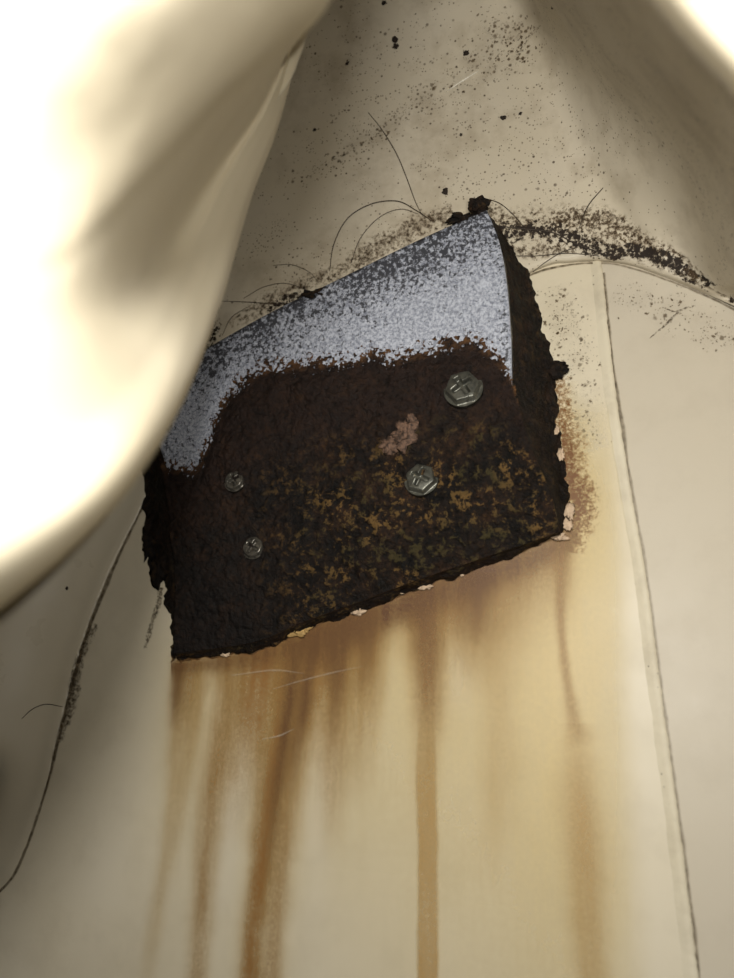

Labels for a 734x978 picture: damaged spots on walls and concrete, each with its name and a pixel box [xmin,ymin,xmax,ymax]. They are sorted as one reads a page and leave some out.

rust [443,195,492,225]
rust [301,288,324,299]
rust [142,328,610,978]